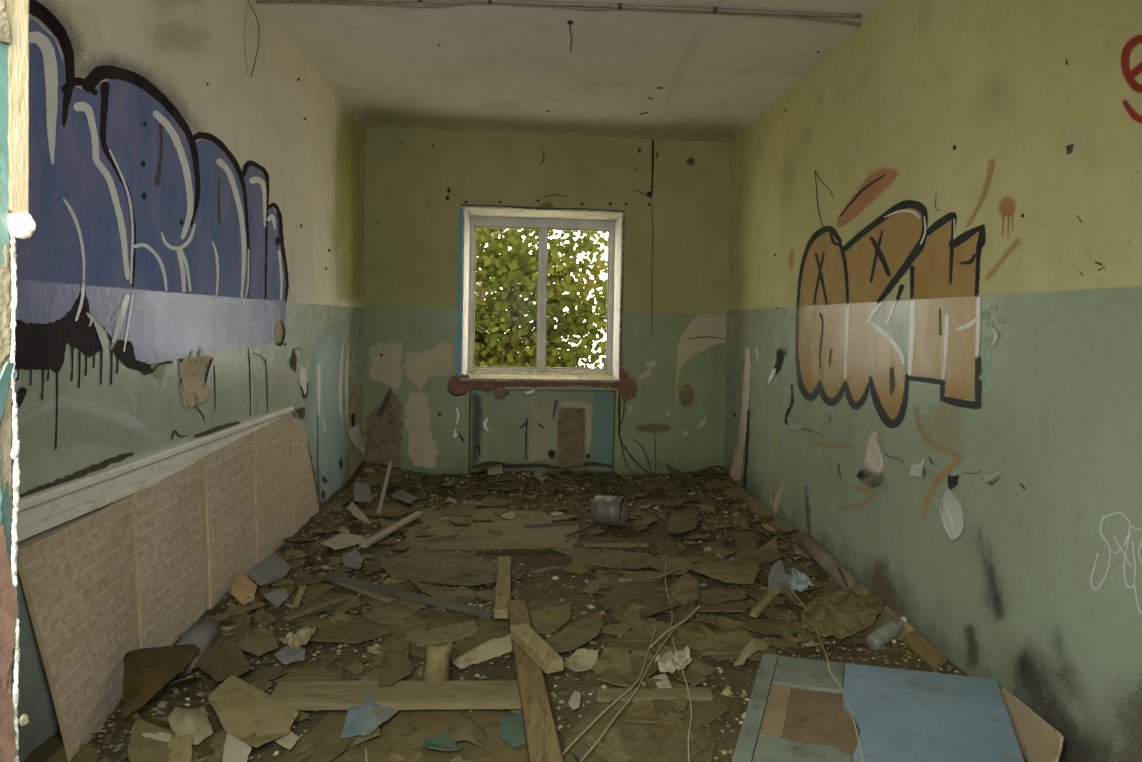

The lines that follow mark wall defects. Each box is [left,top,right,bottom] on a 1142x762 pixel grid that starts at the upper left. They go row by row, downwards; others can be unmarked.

peeling [0,0,29,762]
spalling [143,349,213,409]
peeling [368,340,441,469]
spalling [447,360,656,468]
peeling [664,313,735,416]
peeling [729,346,760,488]
peeling [768,348,785,383]
peeling [856,431,933,486]